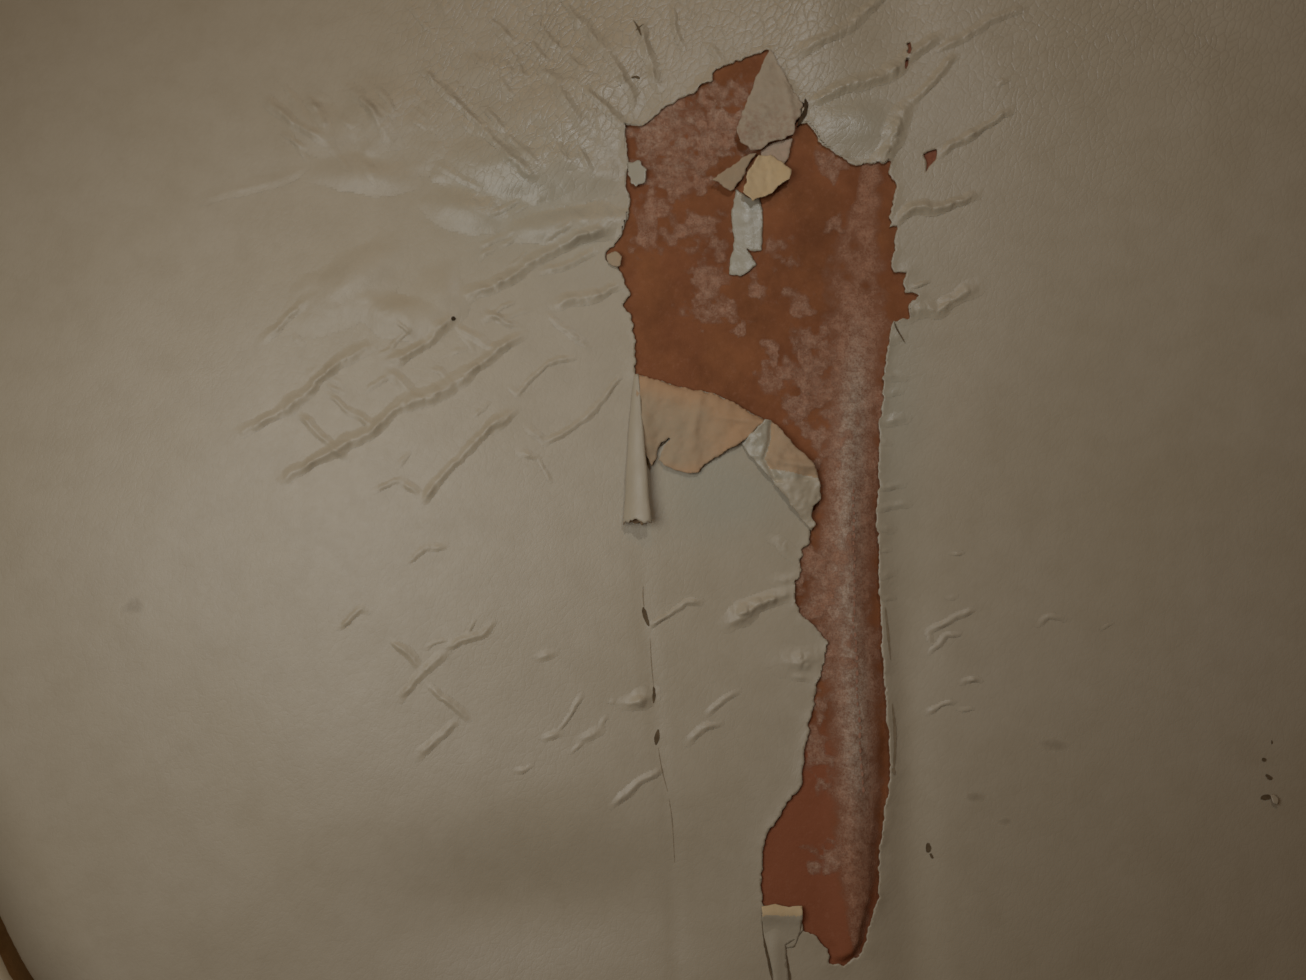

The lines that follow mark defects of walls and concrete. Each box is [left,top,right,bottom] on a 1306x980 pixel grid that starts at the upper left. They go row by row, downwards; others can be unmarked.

peeling [605,50,919,980]